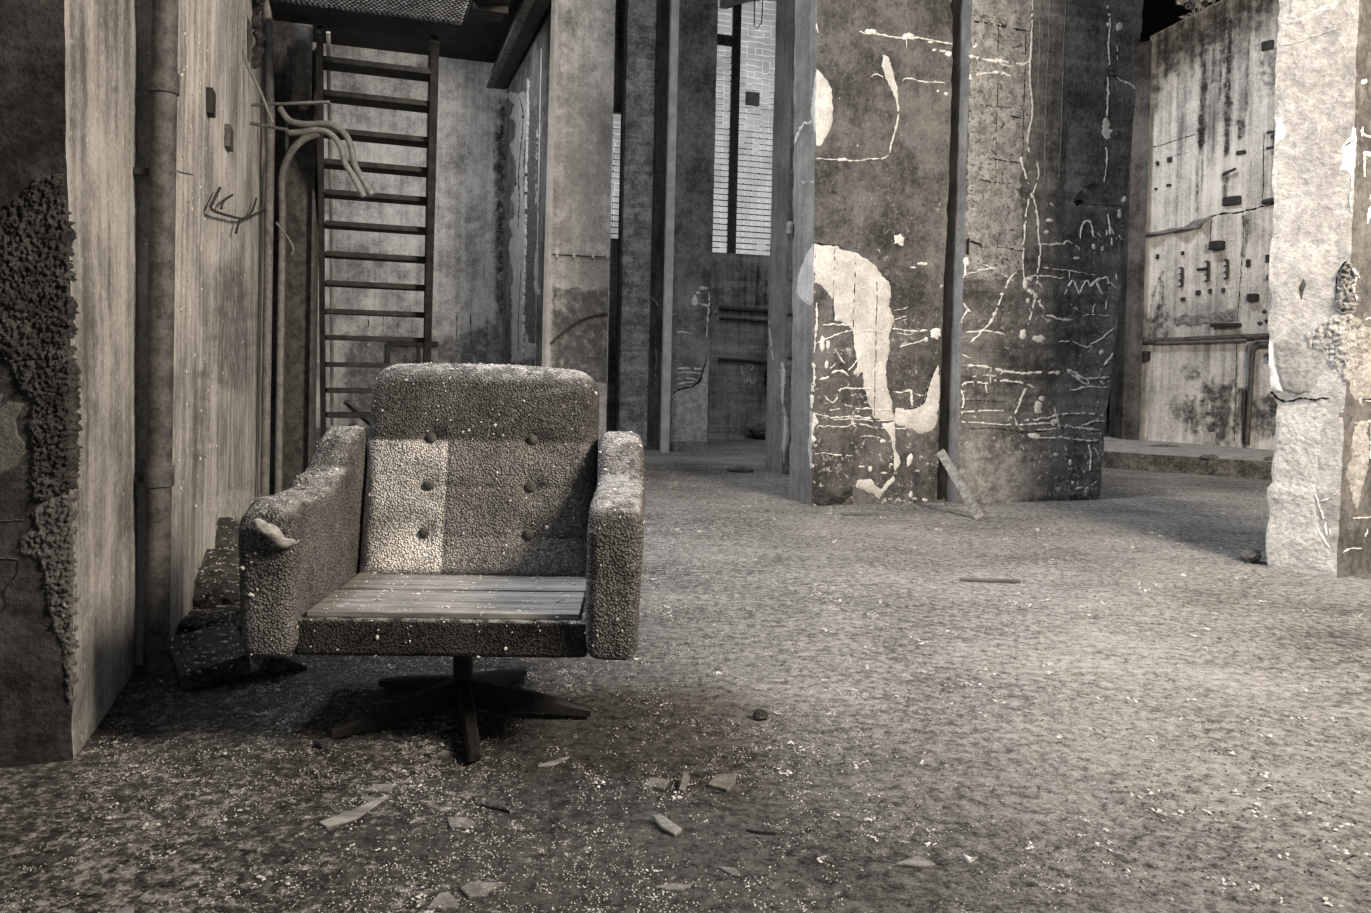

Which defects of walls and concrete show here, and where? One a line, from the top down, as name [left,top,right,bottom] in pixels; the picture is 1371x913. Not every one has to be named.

water stain [432,101,507,364]
flaking render [794,68,833,146]
spalling [859,29,952,56]
spalling [961,0,1113,490]
water stain [1156,0,1261,198]
spalling [1340,127,1371,224]
spalling [0,173,83,707]
water stain [345,316,413,421]
flaking render [796,242,941,499]
crack [965,400,1046,433]
water stain [1170,344,1278,446]
flaking render [1266,260,1371,574]